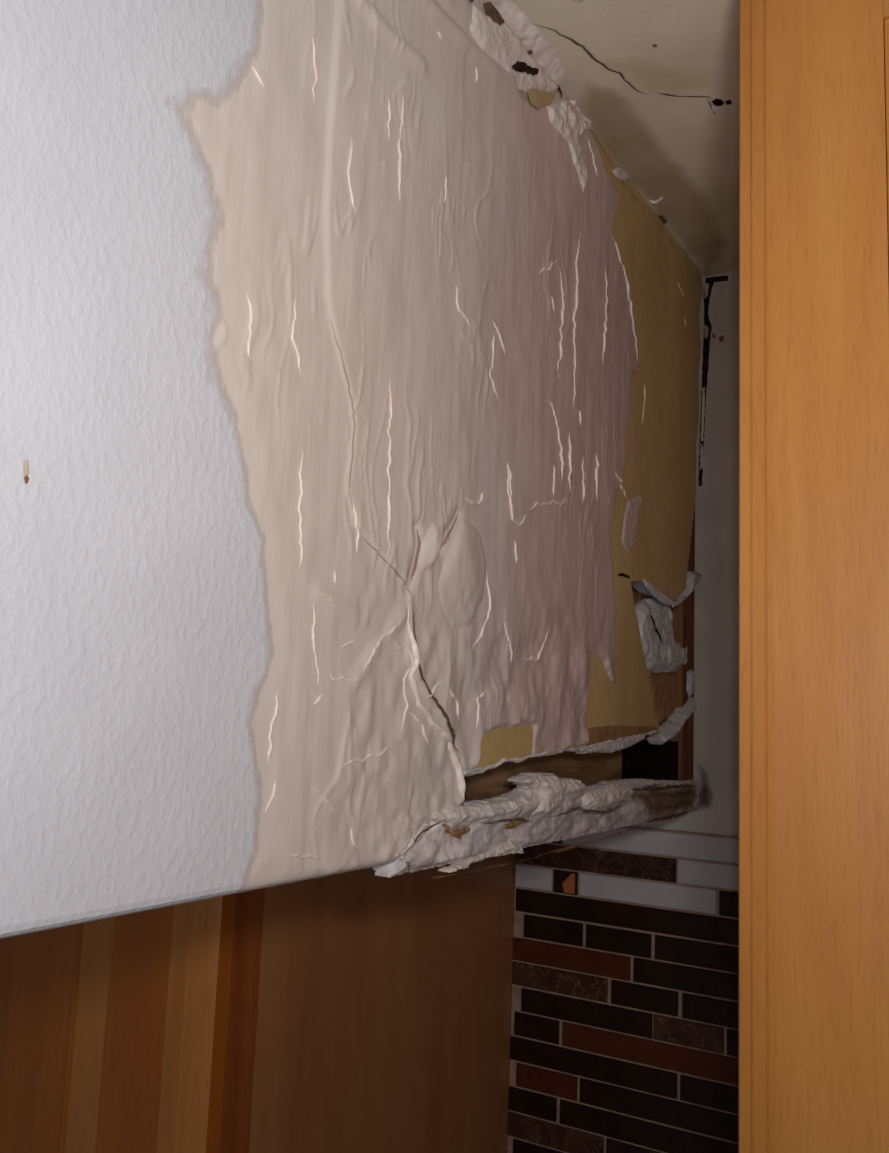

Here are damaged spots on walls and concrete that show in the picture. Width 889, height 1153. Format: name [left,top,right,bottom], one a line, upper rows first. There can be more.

crack [532,23,716,115]
crack [330,317,356,510]
crack [362,536,466,805]
flaking render [375,728,701,878]